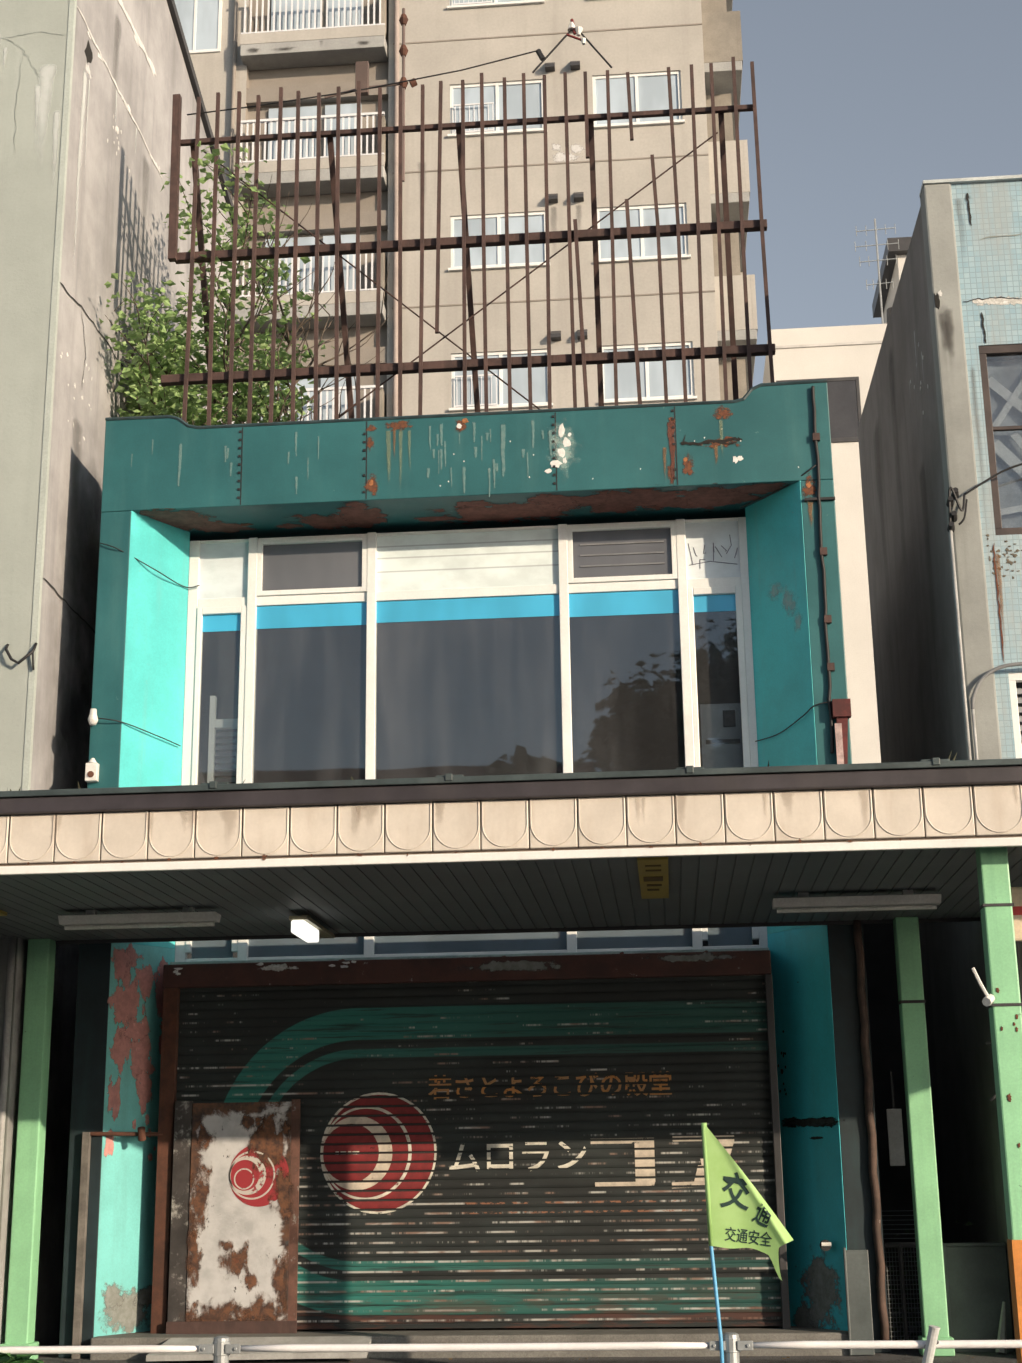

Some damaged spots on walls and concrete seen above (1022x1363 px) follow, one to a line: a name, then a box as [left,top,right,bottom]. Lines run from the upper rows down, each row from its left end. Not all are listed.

crack [4,31,67,154]
rust [366,420,412,451]
peeling [529,423,572,478]
rust [663,417,694,483]
rust [714,405,733,420]
rust [364,474,378,495]
peeling [414,478,786,525]
rust [986,534,1022,661]
peeling [256,963,299,972]
peeling [413,956,561,972]
peeling [104,943,183,1161]
peeling [793,1251,842,1329]